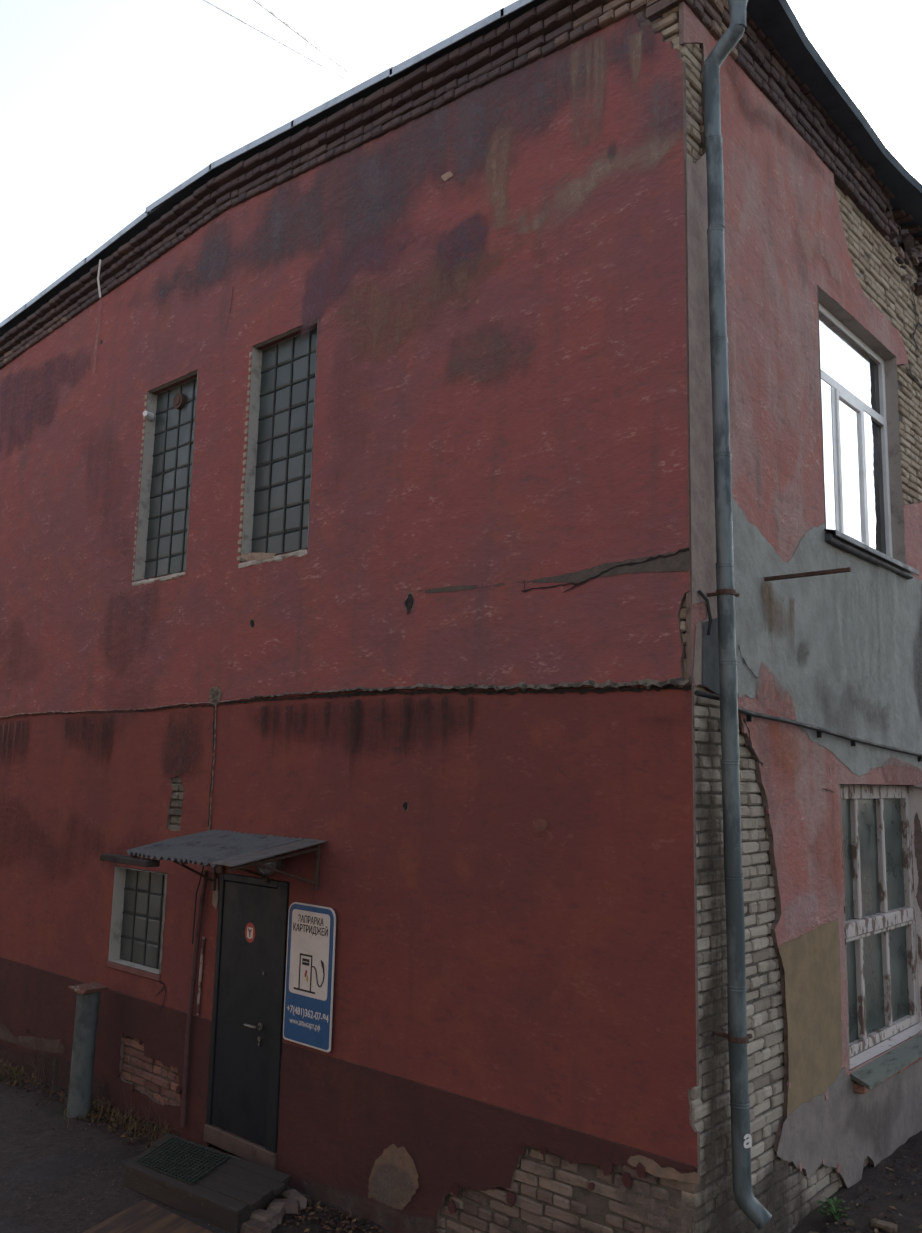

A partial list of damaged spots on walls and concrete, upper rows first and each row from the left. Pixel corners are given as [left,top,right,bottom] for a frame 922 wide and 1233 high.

water stain [159,13,654,332]
flaking render [834,182,922,505]
crack [0,675,691,831]
flaking render [404,6,760,1233]
crack [521,547,689,593]
peeling [732,496,922,787]
flaking render [115,1032,182,1105]
flaking render [739,726,922,1233]